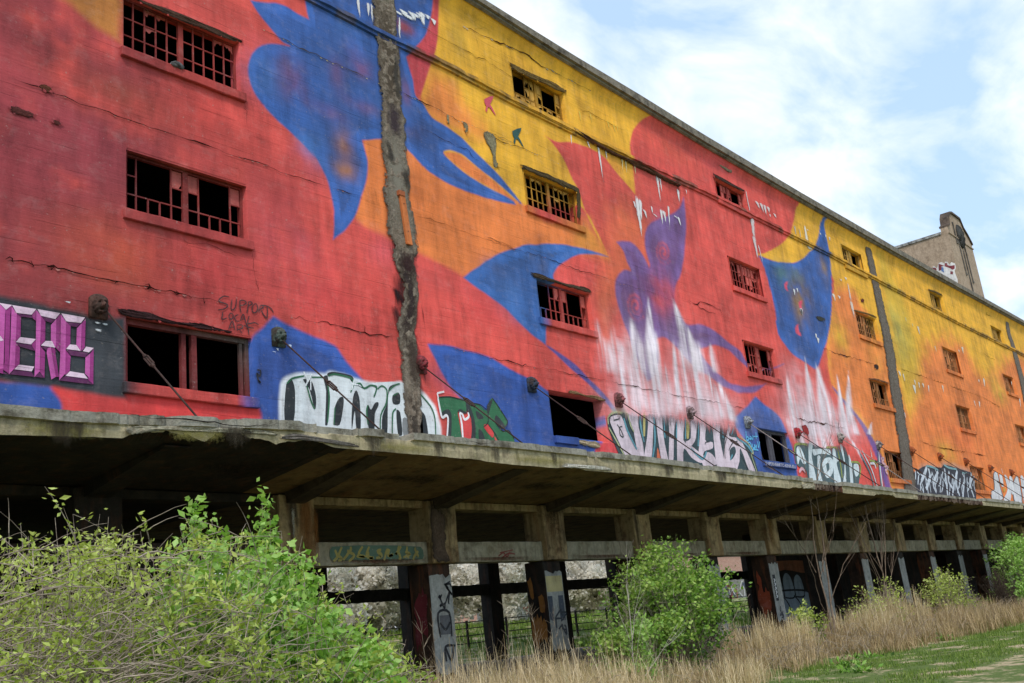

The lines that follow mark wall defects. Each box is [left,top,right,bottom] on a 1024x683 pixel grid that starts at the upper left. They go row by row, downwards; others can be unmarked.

spalling [9,106,37,118]
crack [12,78,362,197]
peeling [372,0,422,434]
crack [6,256,224,304]
crack [291,316,394,337]